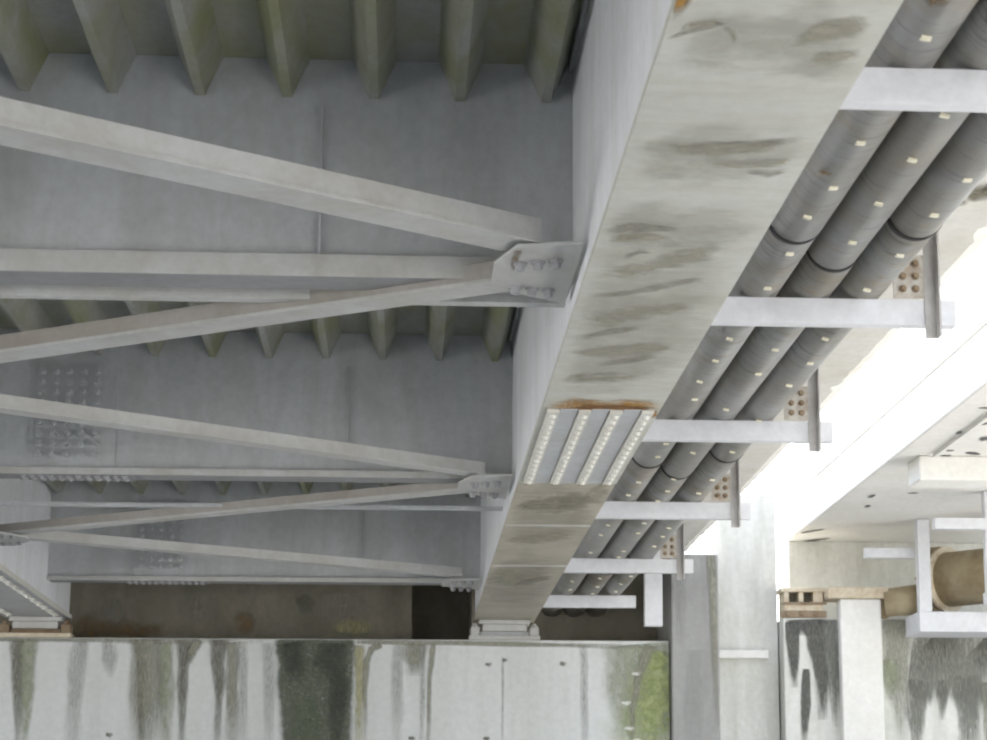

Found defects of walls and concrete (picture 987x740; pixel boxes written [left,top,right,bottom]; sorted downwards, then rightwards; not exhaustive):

leakage [678,141,787,176]
leakage [588,306,684,337]
leakage [576,344,669,382]
corrosion [556,400,656,417]
leakage [0,600,243,732]
leakage [316,592,611,739]